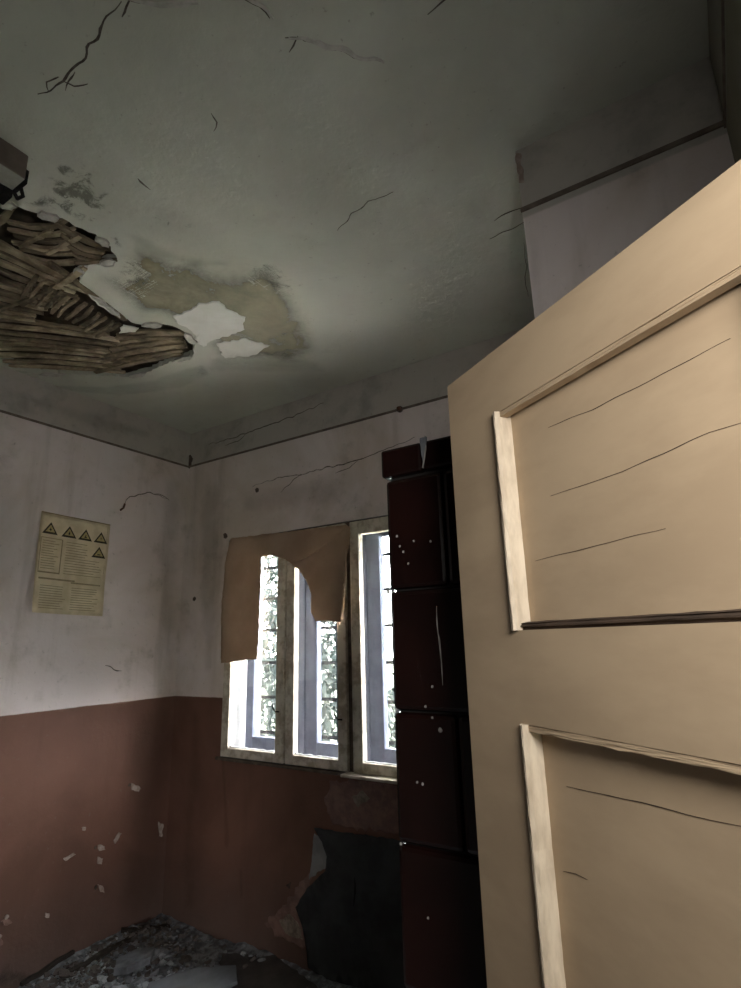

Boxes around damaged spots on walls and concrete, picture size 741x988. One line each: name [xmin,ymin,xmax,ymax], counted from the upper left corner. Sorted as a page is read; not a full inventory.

crack [38,0,199,95]
crack [229,0,385,64]
flaking render [0,201,270,379]
peeling [265,833,327,949]